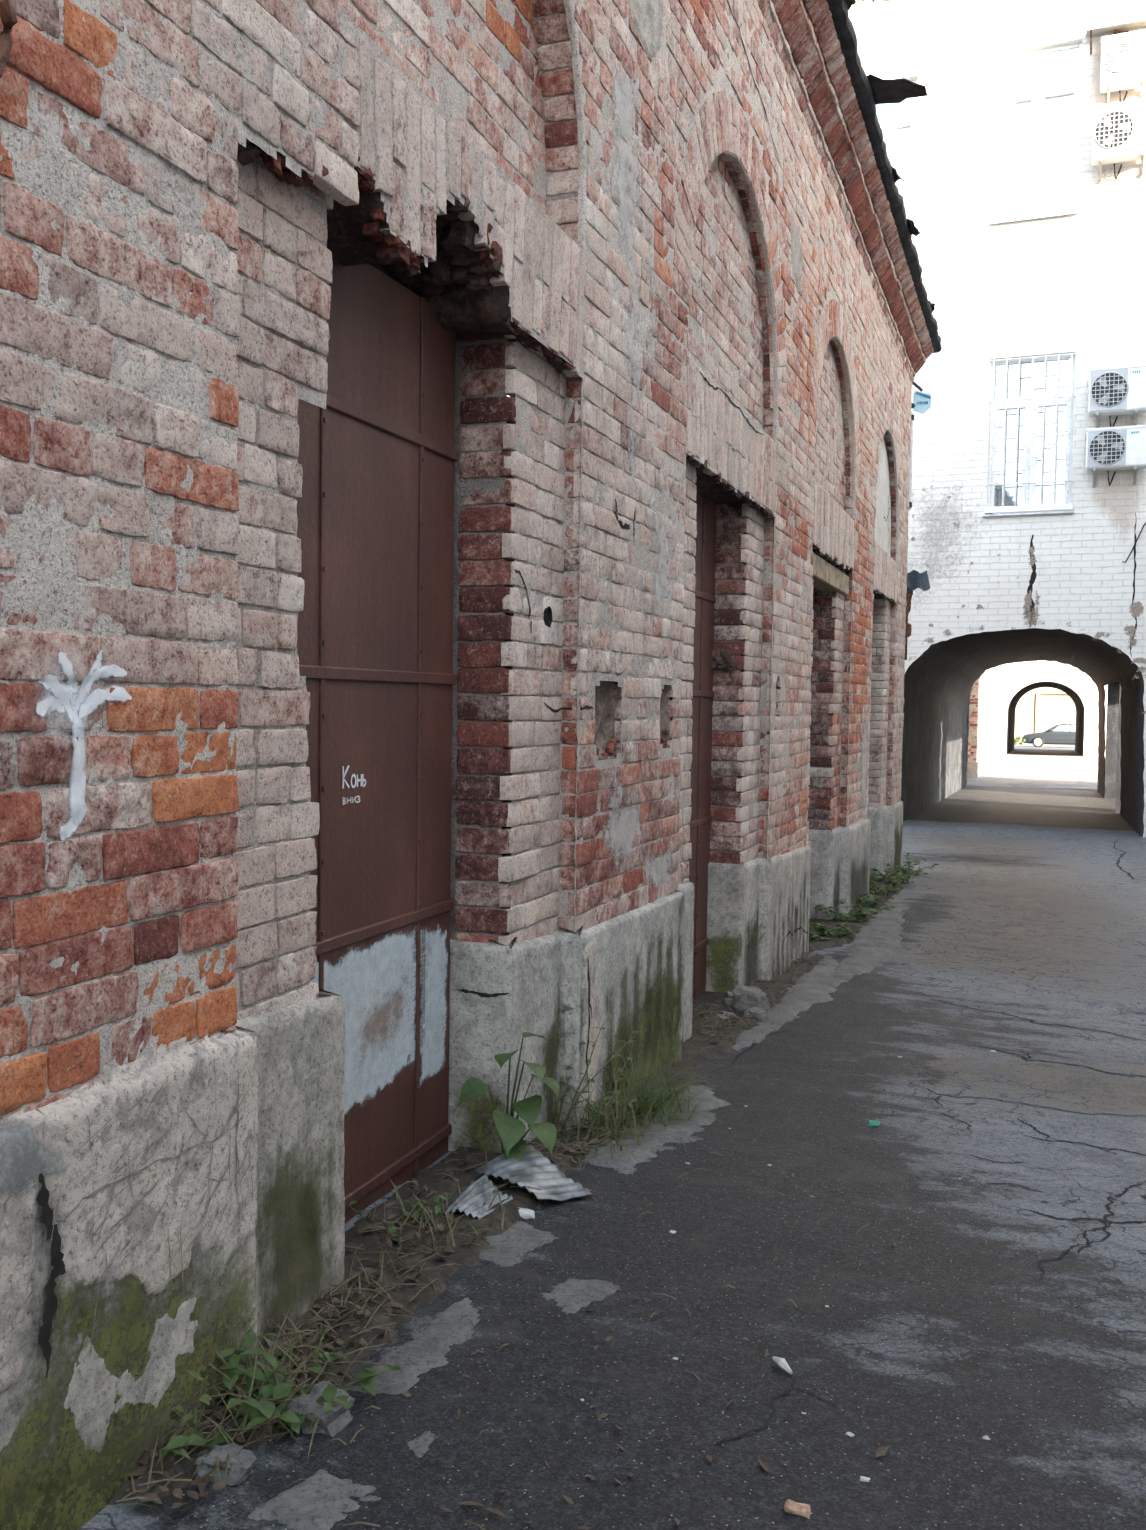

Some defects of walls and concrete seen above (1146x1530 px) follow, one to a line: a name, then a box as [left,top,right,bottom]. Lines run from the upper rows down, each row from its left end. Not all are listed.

peeling [237,142,329,187]
peeling [354,157,503,291]
crack [1023,535,1041,627]
crack [1124,512,1144,657]
peeling [310,929,448,1115]
crack [931,998,1146,1077]
flaking render [0,1030,258,1454]
crack [36,1078,243,1378]
crack [910,1085,1146,1280]